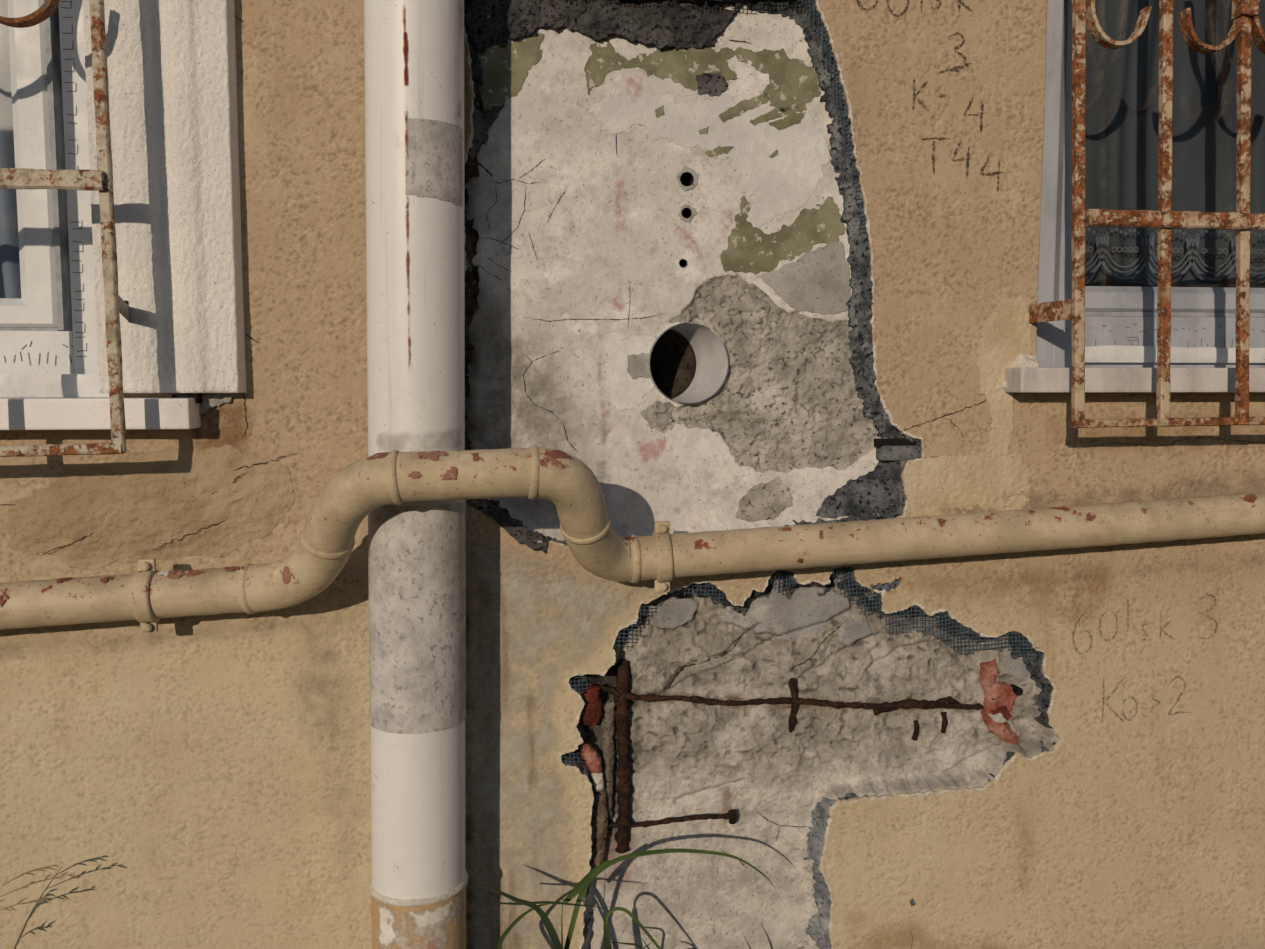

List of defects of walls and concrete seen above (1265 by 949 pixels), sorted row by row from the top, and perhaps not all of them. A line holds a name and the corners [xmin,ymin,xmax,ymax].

crack [478,159,565,281]
flaking render [464,0,924,537]
peeling [408,451,457,480]
flaking render [465,497,569,548]
spalling [559,558,1064,949]